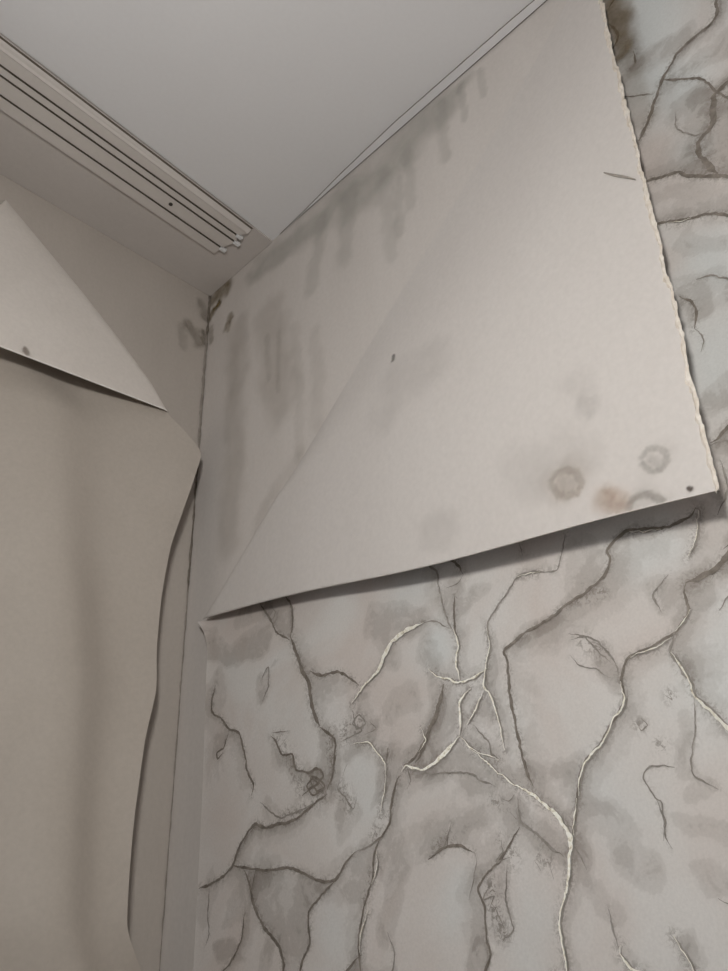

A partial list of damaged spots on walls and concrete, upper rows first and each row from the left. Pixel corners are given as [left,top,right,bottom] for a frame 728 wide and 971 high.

peeling [0,200,168,412]
peeling [203,0,720,620]